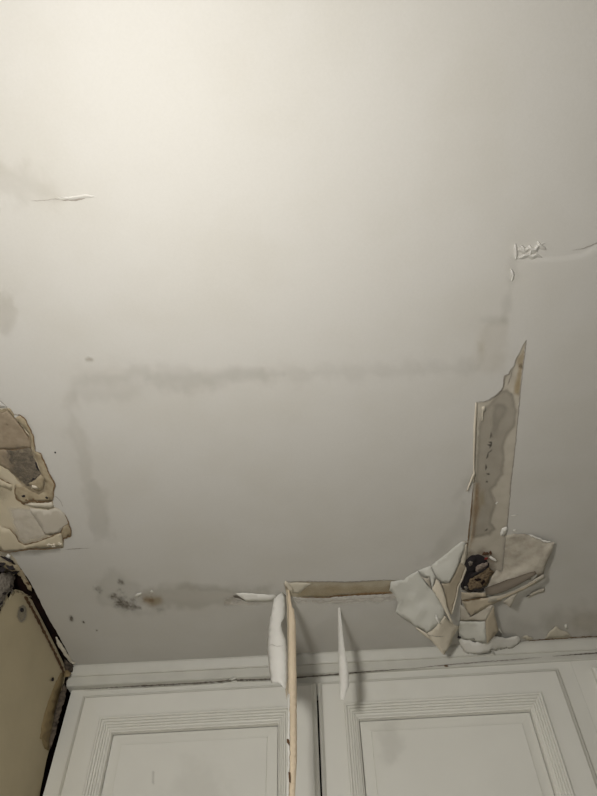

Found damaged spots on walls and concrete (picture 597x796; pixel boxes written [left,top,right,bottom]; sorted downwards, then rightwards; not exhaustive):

peeling [0,401,87,591]